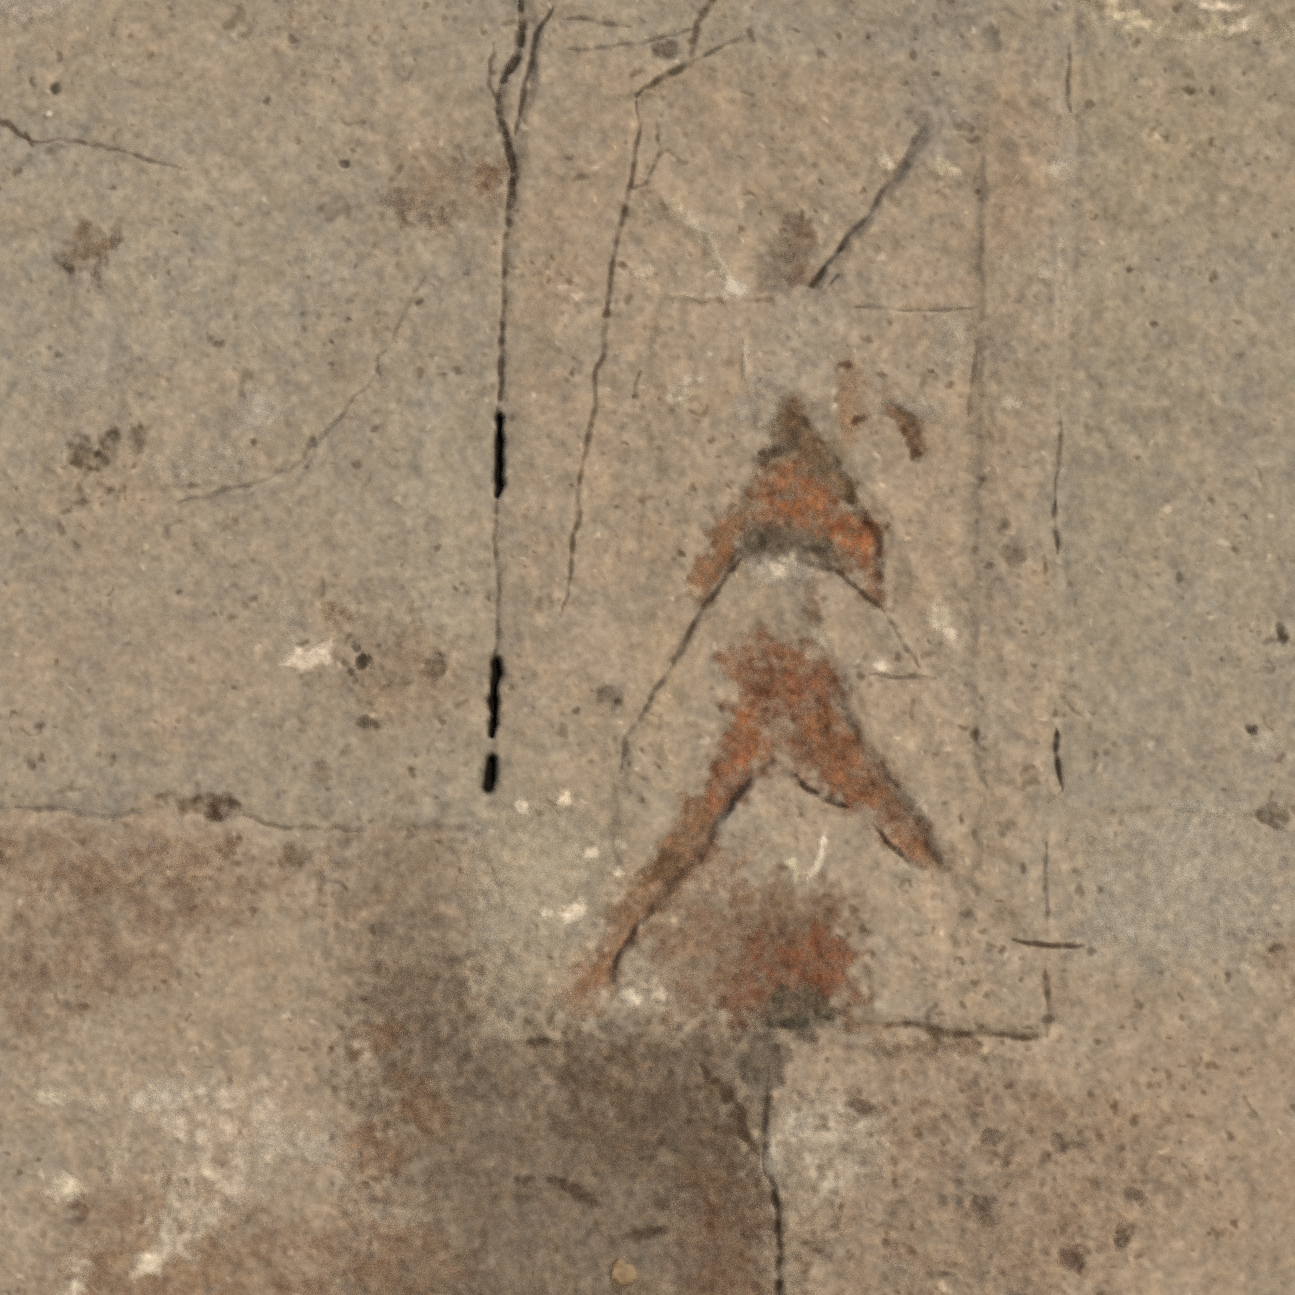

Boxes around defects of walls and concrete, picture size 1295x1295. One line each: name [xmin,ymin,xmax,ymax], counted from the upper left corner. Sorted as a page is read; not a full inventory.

crack [605,0,720,315]
crack [490,0,615,556]
crack [564,521,580,603]
crack [685,560,739,641]
corrosion [696,400,881,605]
corrosion [884,404,922,455]
crack [483,620,501,792]
crack [644,680,663,711]
corrosion [584,631,926,986]
corrosion [661,890,852,1030]
leakage [431,1049,752,1295]